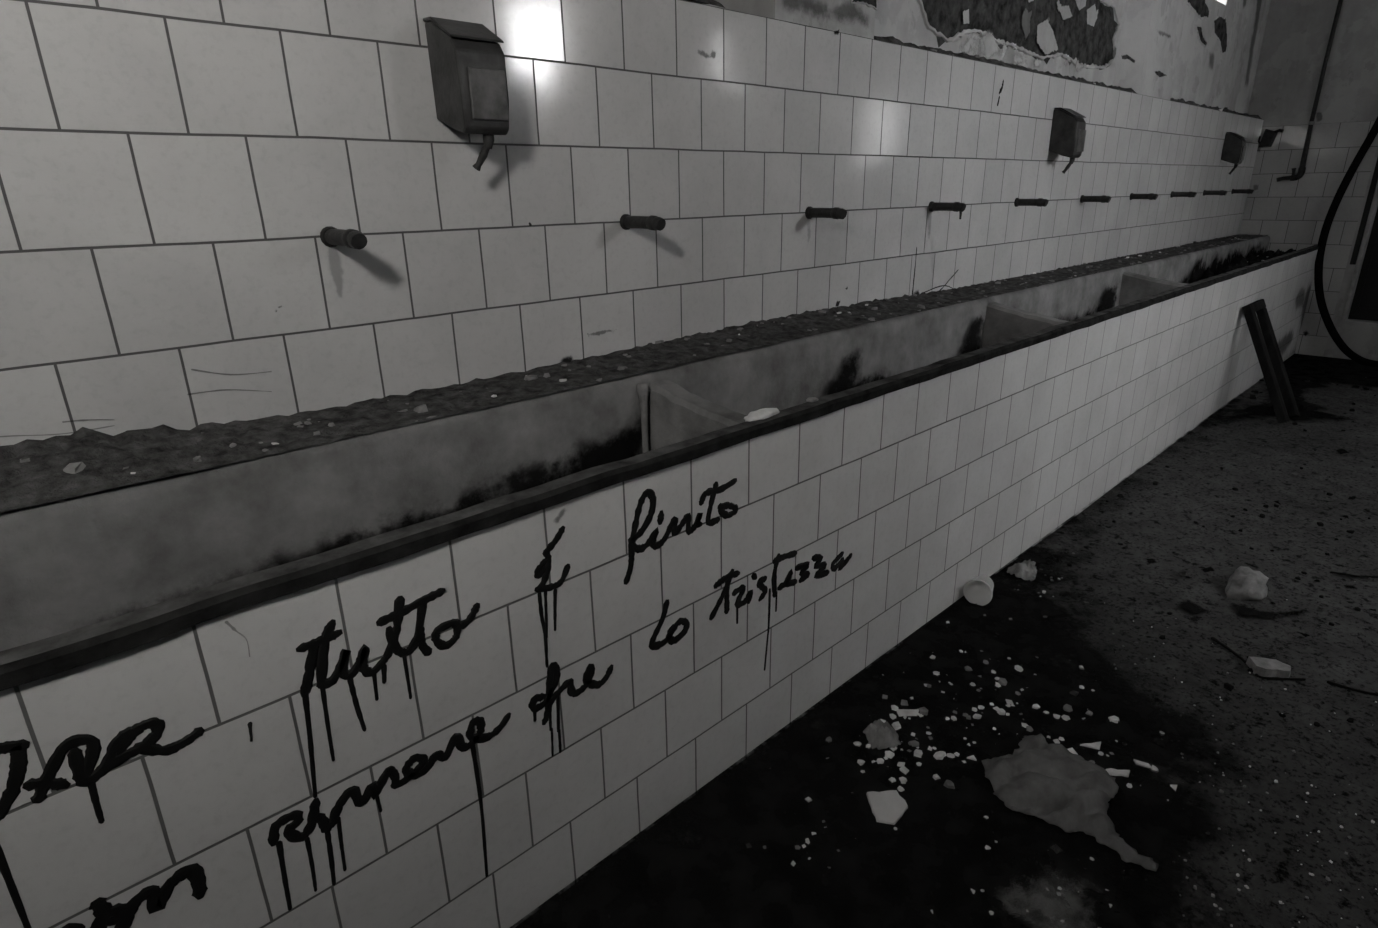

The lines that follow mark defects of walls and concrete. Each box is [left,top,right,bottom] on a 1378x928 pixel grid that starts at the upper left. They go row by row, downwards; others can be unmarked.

flaking render [850,0,878,10]
flaking render [917,0,1120,70]
flaking render [1187,0,1228,55]